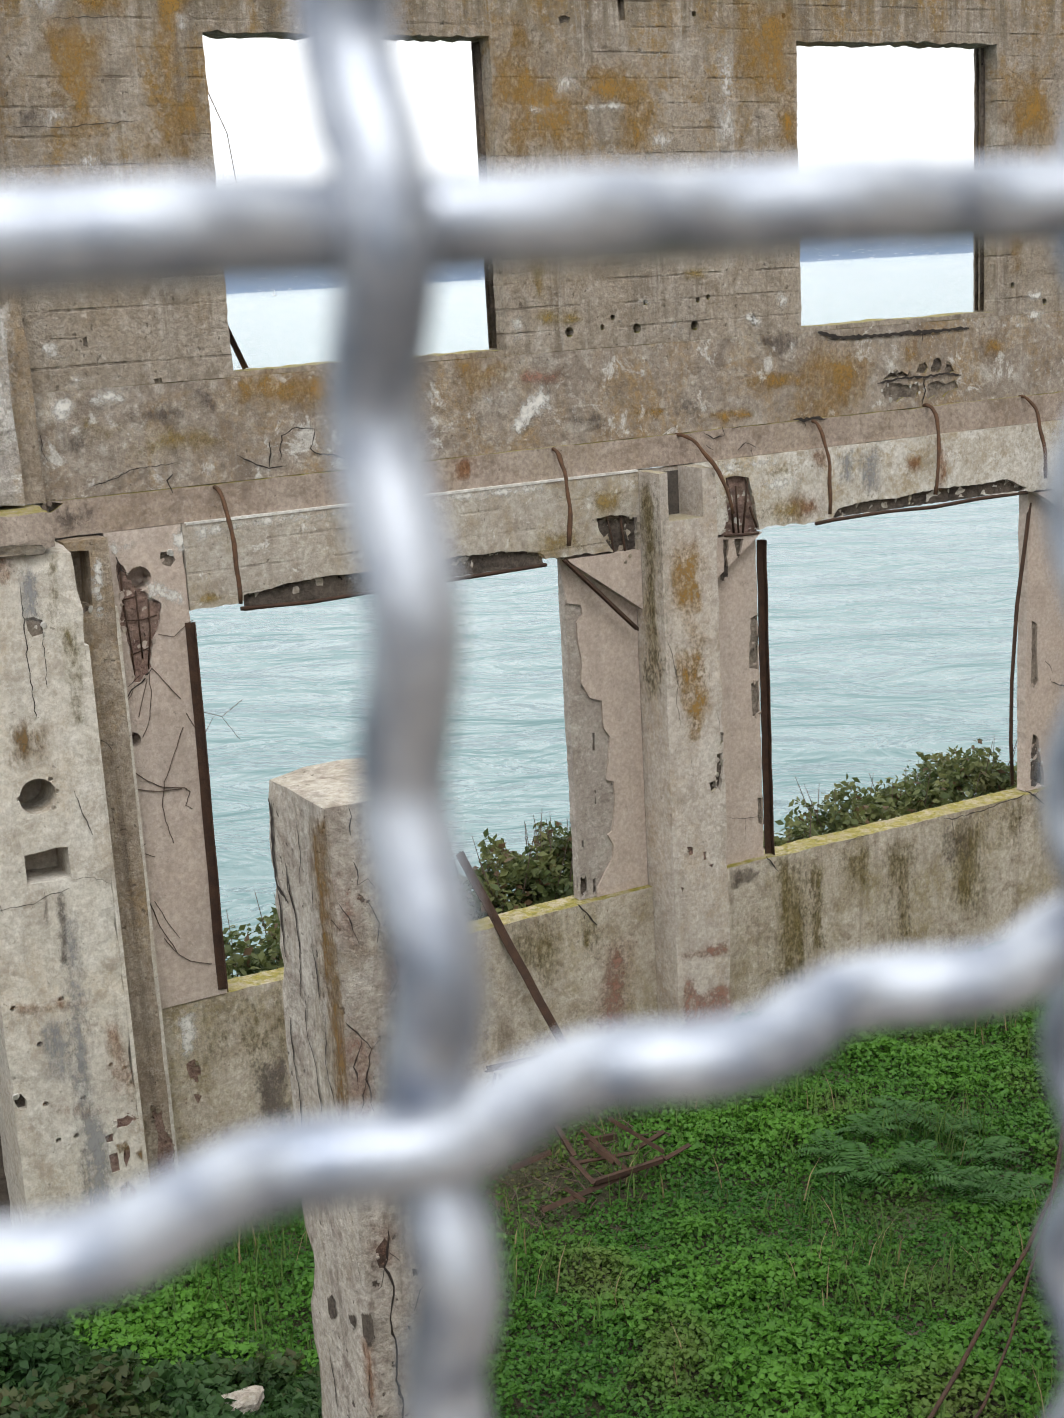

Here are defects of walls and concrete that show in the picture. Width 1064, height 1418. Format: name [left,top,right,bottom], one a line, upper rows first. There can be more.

spalling [881,358,956,403]
rust [793,500,816,516]
spalling [815,479,1028,526]
spalling [597,513,640,563]
spalling [455,551,547,581]
spalling [240,573,363,611]
crack [128,668,152,698]
damp [810,870,823,947]
rust [685,943,728,957]
rust [684,981,731,1018]
crack [329,1231,404,1418]